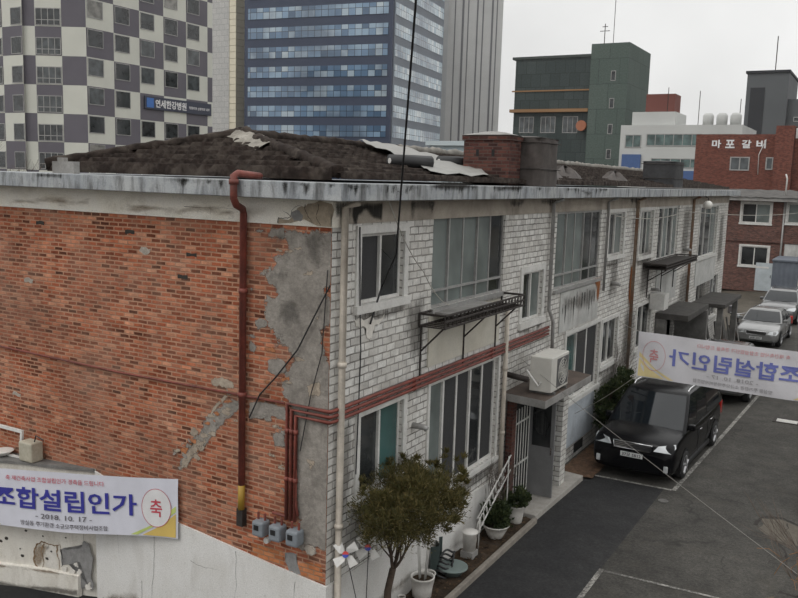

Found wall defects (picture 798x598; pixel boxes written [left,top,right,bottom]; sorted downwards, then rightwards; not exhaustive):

spalling [19,535,94,591]